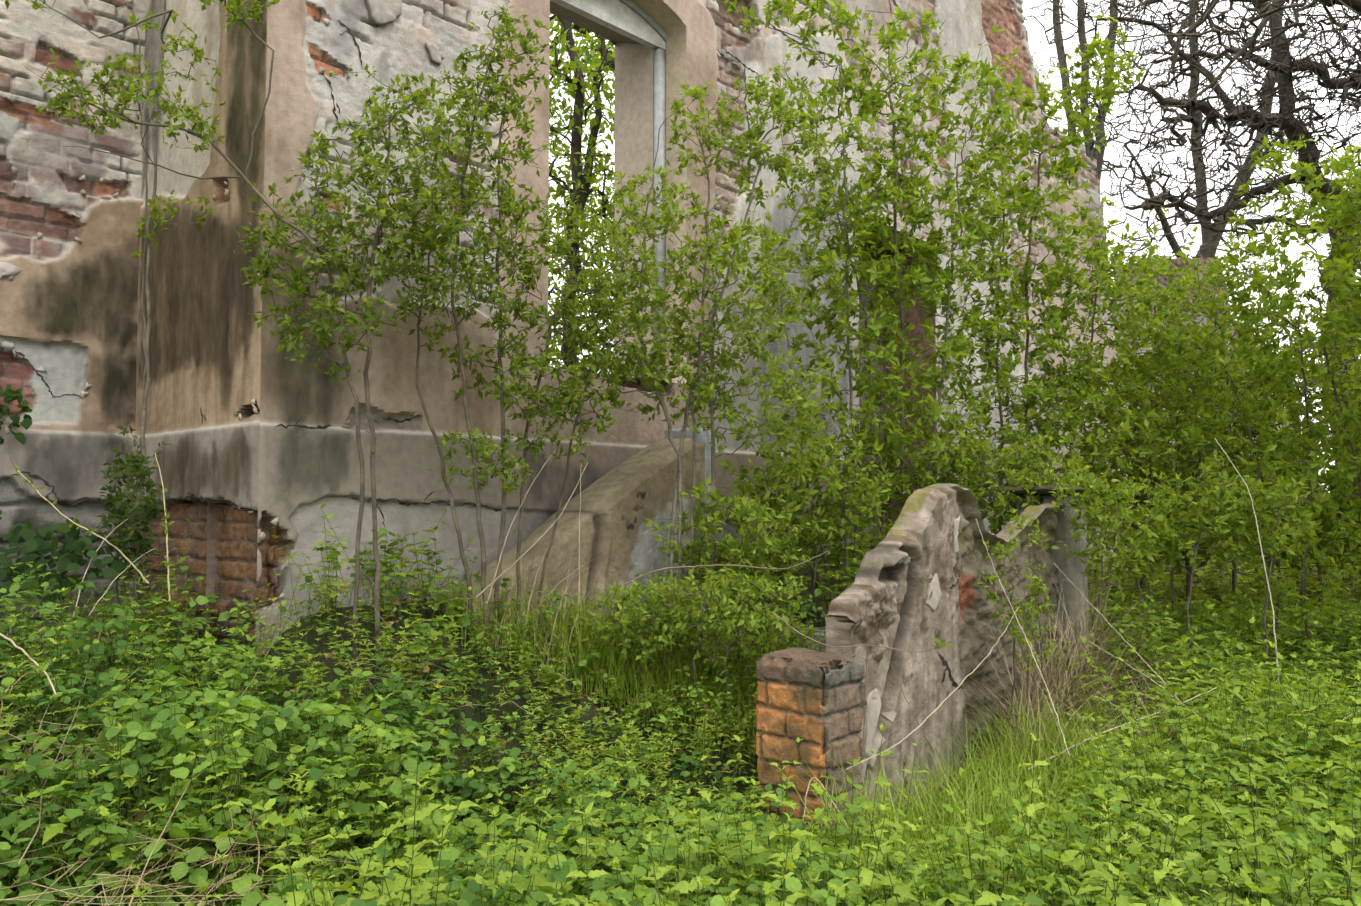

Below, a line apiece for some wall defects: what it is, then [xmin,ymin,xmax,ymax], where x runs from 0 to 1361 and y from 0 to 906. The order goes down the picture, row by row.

flaking render [99,0,134,8]
flaking render [305,0,331,26]
flaking render [34,39,86,83]
flaking render [306,41,352,79]
flaking render [981,0,1036,105]
flaking render [0,94,56,126]
flaking render [0,154,87,243]
flaking render [56,171,133,199]
leakage [36,204,261,419]
flaking render [0,335,92,426]
leakage [60,434,115,495]
flaking render [160,497,294,611]